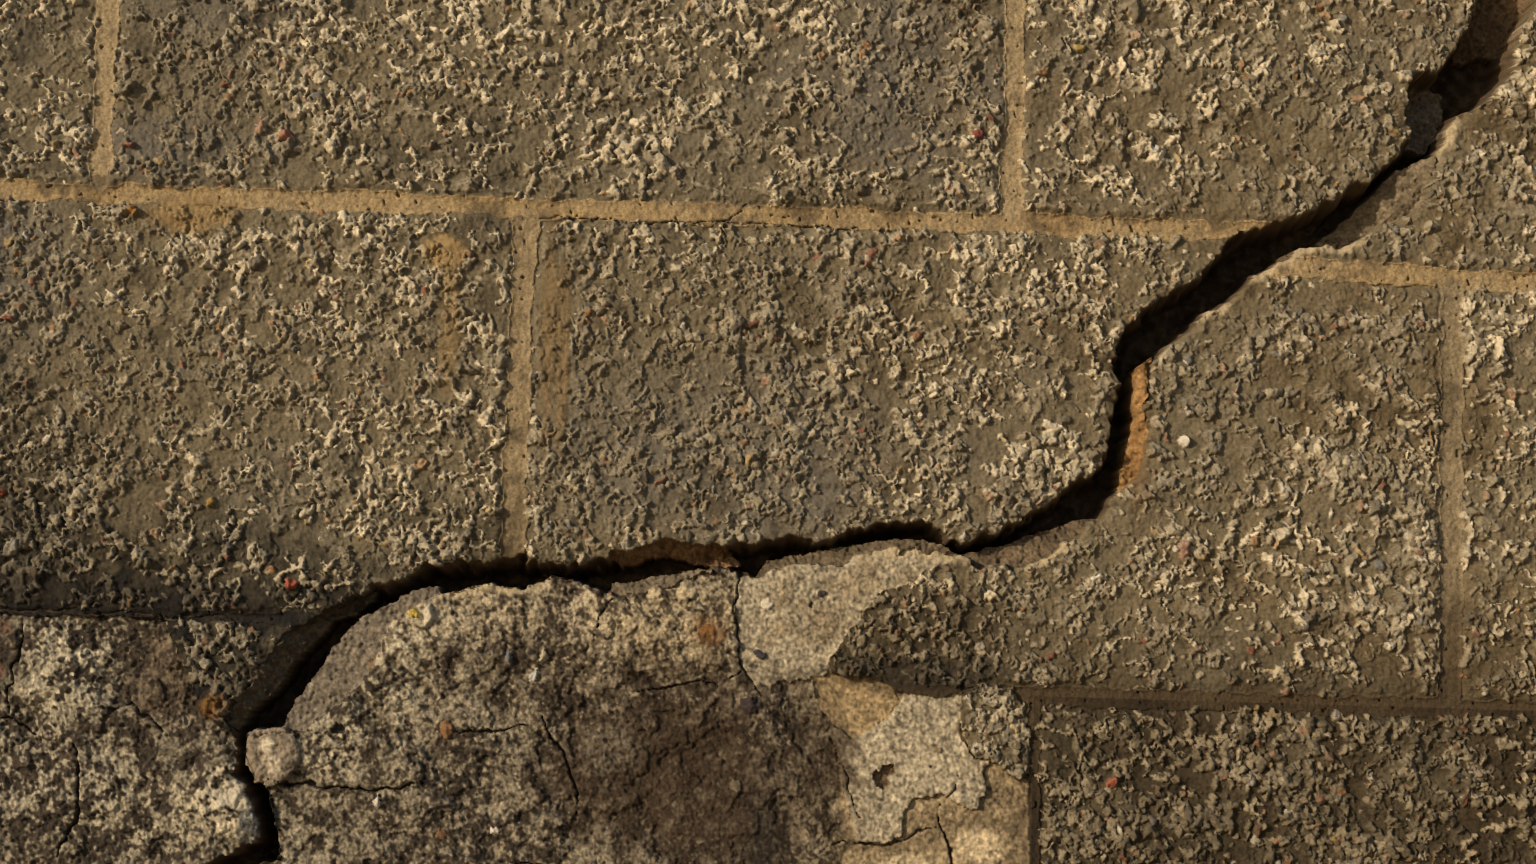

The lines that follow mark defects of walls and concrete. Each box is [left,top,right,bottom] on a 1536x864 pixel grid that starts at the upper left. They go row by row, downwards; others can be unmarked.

crack [523,205,859,235]
crack [724,0,1536,579]
crack [733,577,762,697]
crack [209,539,741,864]
crack [822,739,959,864]